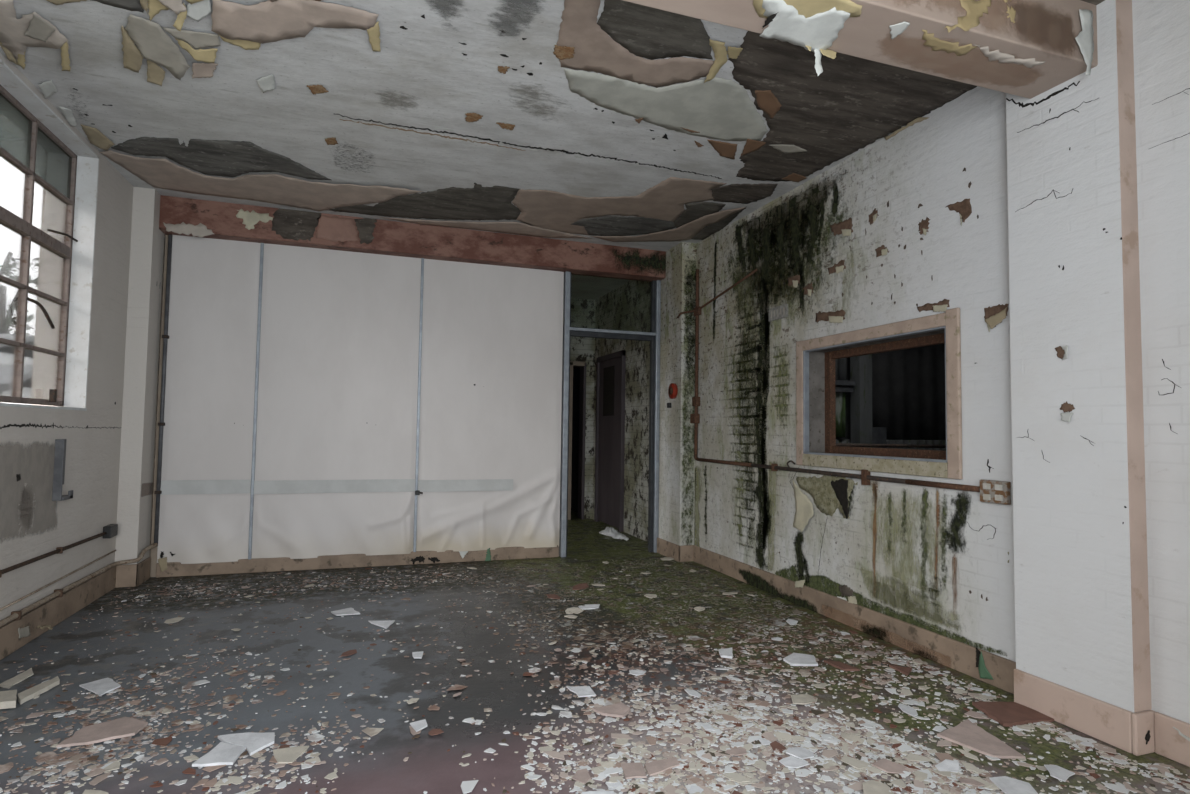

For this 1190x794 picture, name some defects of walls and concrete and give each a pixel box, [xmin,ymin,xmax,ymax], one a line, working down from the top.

peeling [1075,9,1094,75]
peeling [38,0,979,276]
crack [1006,81,1099,133]
spalling [815,293,845,323]
spalling [916,299,950,312]
spalling [984,304,1008,332]
crack [0,422,117,430]
leakage [682,260,696,545]
leakage [713,170,847,613]
flaking render [790,475,858,571]
leakage [864,489,971,626]
leakage [861,625,891,643]